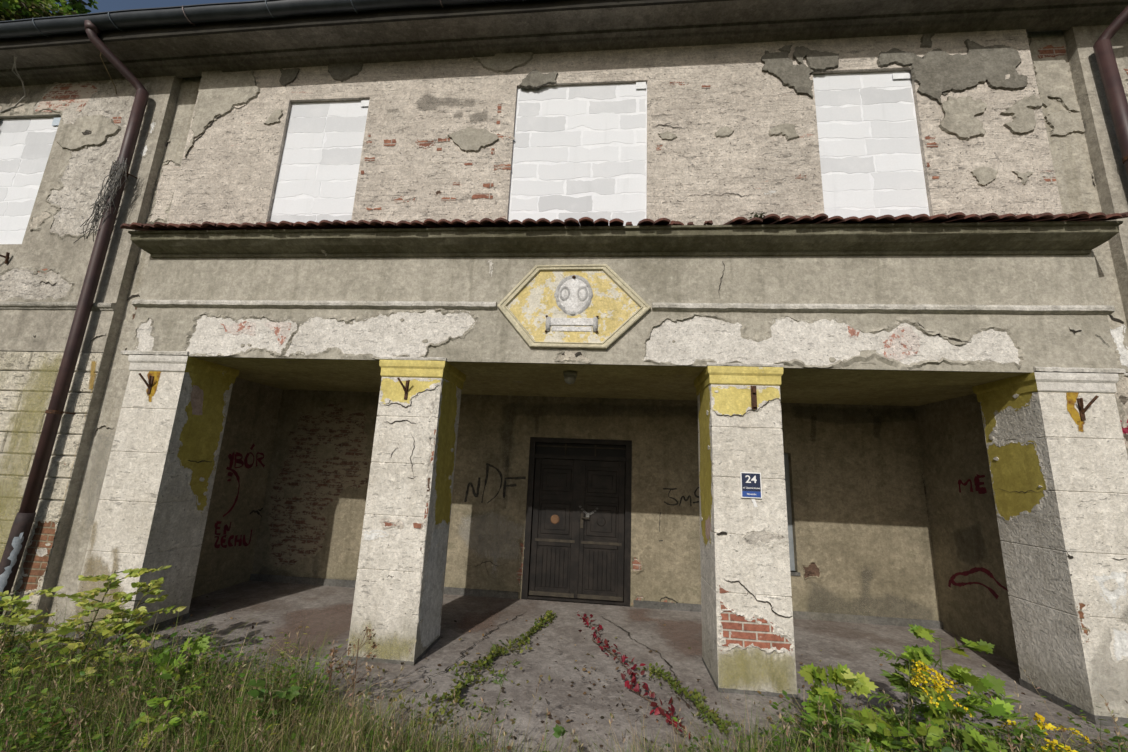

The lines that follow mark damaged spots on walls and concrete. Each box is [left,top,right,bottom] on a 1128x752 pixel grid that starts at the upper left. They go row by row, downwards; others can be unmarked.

flaking render [1038,45,1066,59]
spalling [0,77,157,240]
spalling [146,158,182,224]
spalling [183,308,481,360]
spalling [641,312,1024,370]
peeling [174,372,233,524]
peeling [980,392,1049,525]
flaking render [0,517,60,600]
flaking render [717,585,795,656]
crack [724,575,793,618]